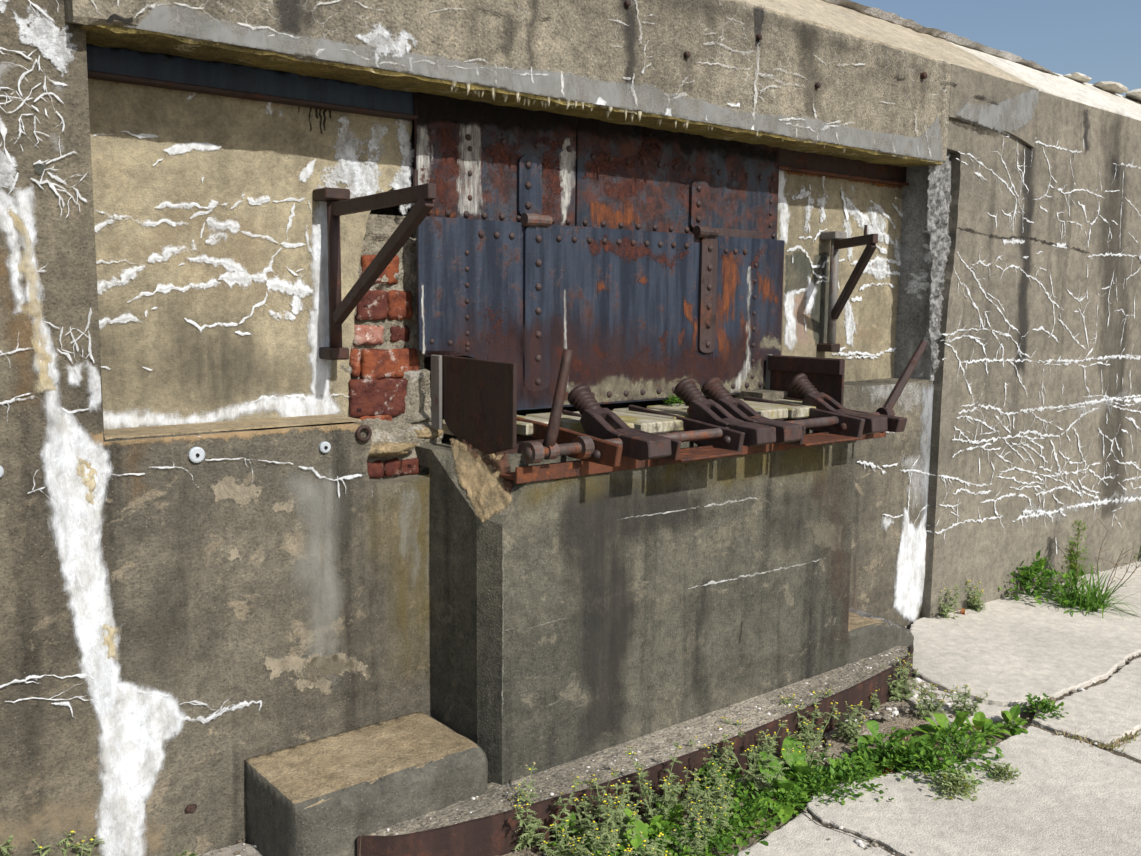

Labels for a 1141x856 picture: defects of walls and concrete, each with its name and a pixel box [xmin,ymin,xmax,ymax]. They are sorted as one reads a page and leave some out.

crack [0,0,313,370]
spalling [358,214,406,278]
spalling [340,230,512,522]
corrosion [538,135,563,215]
damp [298,92,901,349]
corrosion [450,249,783,408]
corrosion [588,200,689,270]
crack [857,77,1141,554]
damp [0,152,340,856]
damp [884,509,927,621]
crack [0,668,95,716]
peeling [263,652,368,695]